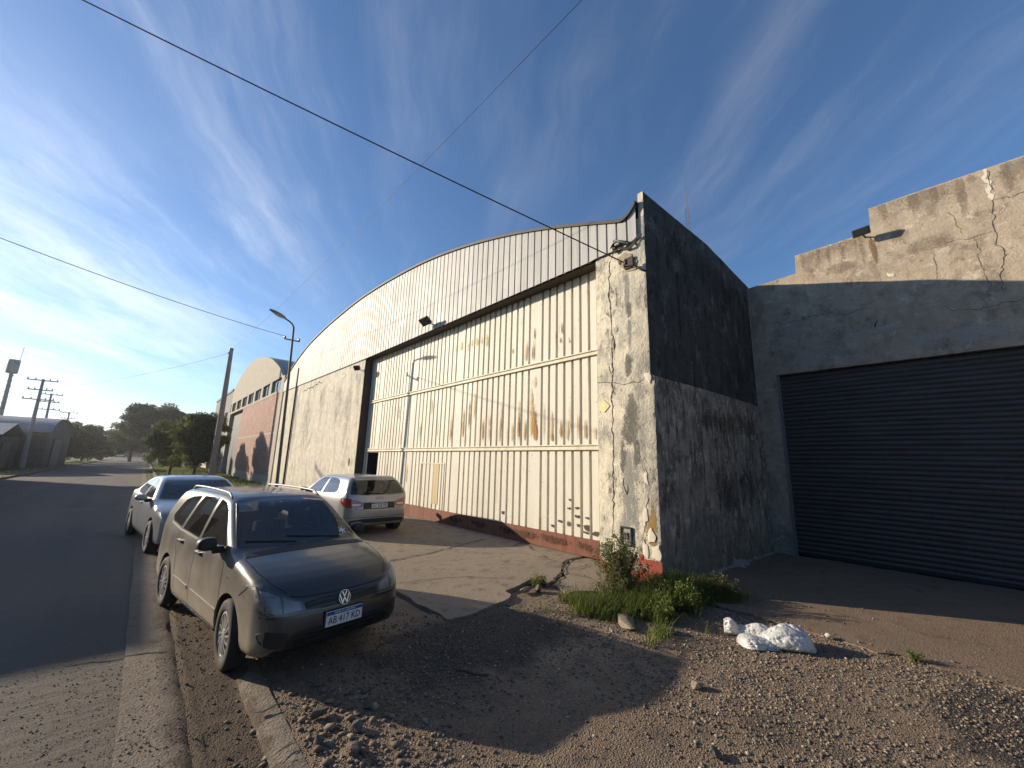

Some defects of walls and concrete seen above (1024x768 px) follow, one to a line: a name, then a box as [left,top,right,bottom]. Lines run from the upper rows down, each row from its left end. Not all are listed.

crack [868,237,878,263]
crack [932,192,1022,311]
rust [431,376,595,441]
crack [598,233,643,544]
peeling [627,498,662,571]